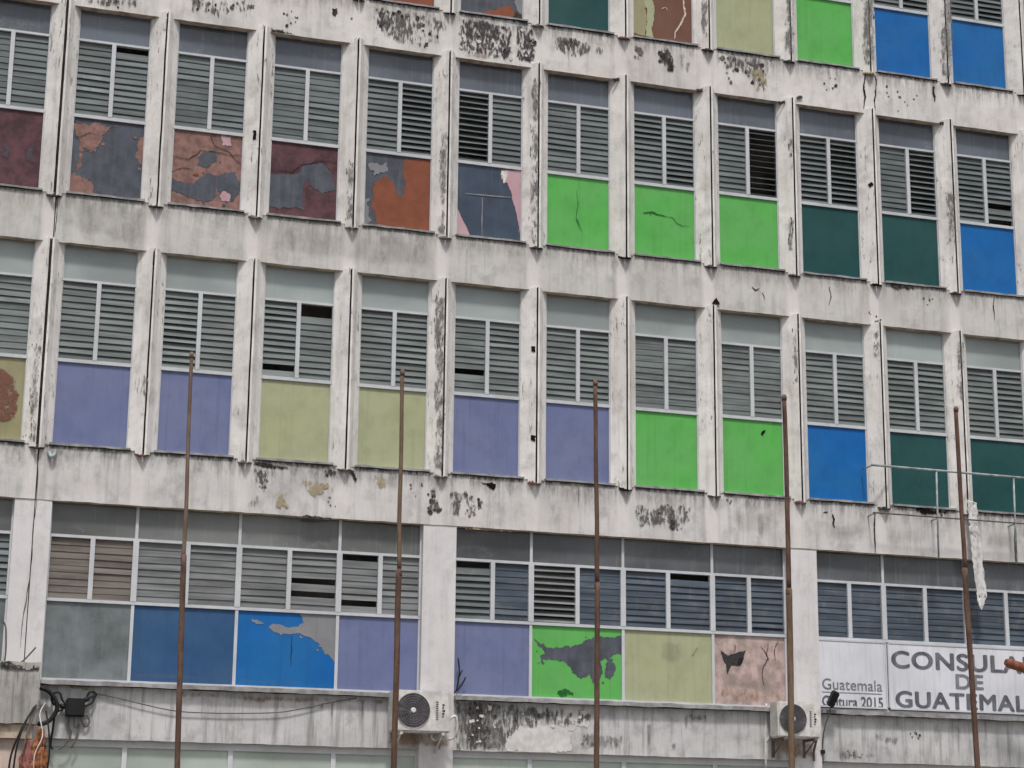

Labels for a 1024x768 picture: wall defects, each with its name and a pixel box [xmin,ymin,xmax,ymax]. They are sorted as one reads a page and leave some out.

mould [376,7,445,47]
water stain [459,20,537,62]
mould [555,37,603,57]
mould [658,48,690,72]
peeling [701,0,794,91]
peeling [46,121,117,198]
peeling [134,136,144,177]
peeling [171,135,241,206]
peeling [252,613,336,662]
peeling [534,636,621,684]
mould [455,701,591,750]
water stain [581,734,618,747]